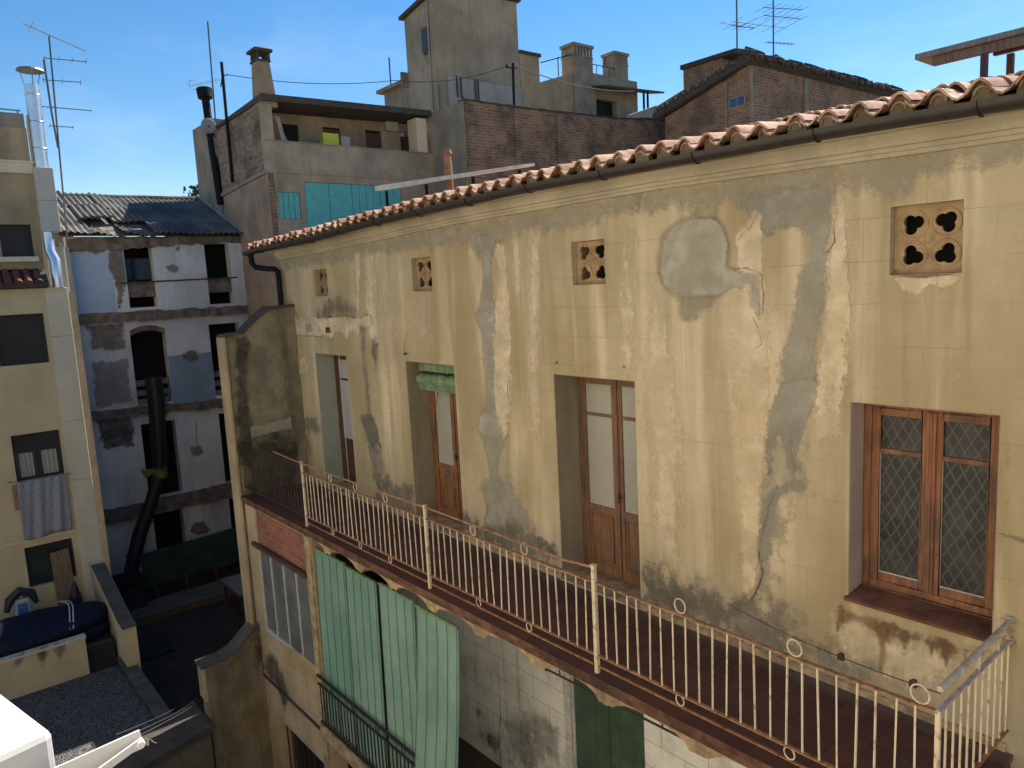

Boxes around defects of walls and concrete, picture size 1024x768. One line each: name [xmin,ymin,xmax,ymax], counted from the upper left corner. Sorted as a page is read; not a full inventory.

spalling [89,250,126,309]
spalling [85,323,135,450]
damp [235,338,299,494]
damp [318,253,411,510]
damp [619,236,797,656]
peeling [729,210,771,595]
crack [743,186,834,603]
peeling [811,185,851,441]
damp [802,614,978,687]